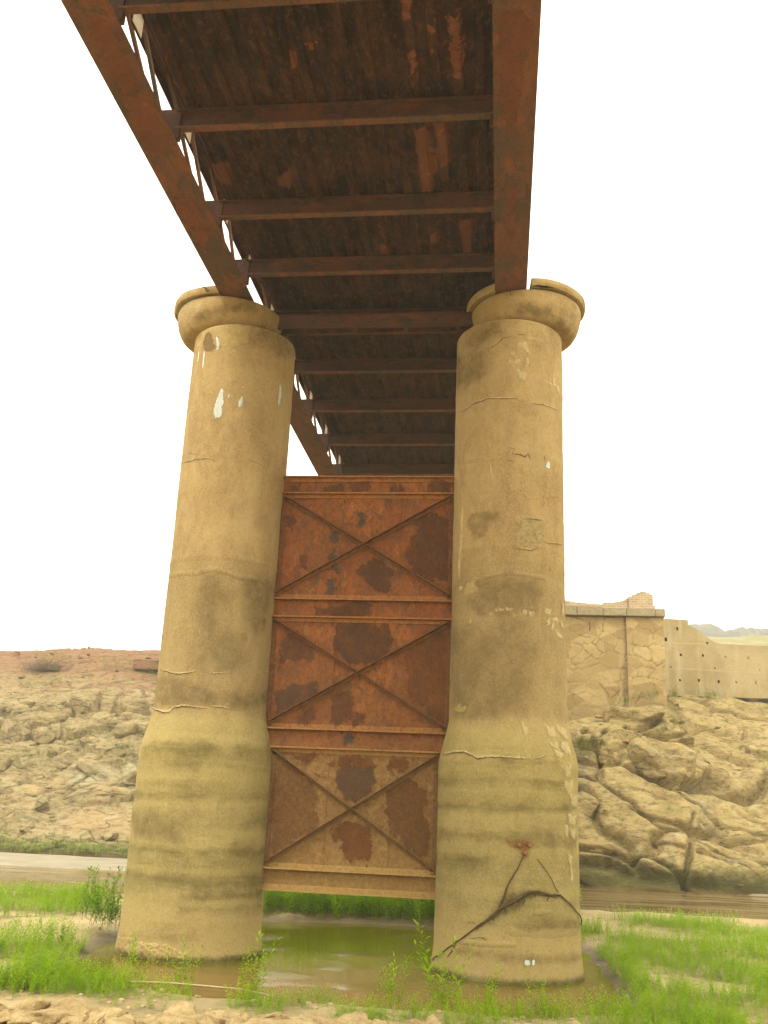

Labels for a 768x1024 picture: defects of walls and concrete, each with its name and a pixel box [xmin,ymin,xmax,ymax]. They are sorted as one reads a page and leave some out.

crack [443,750,547,759]